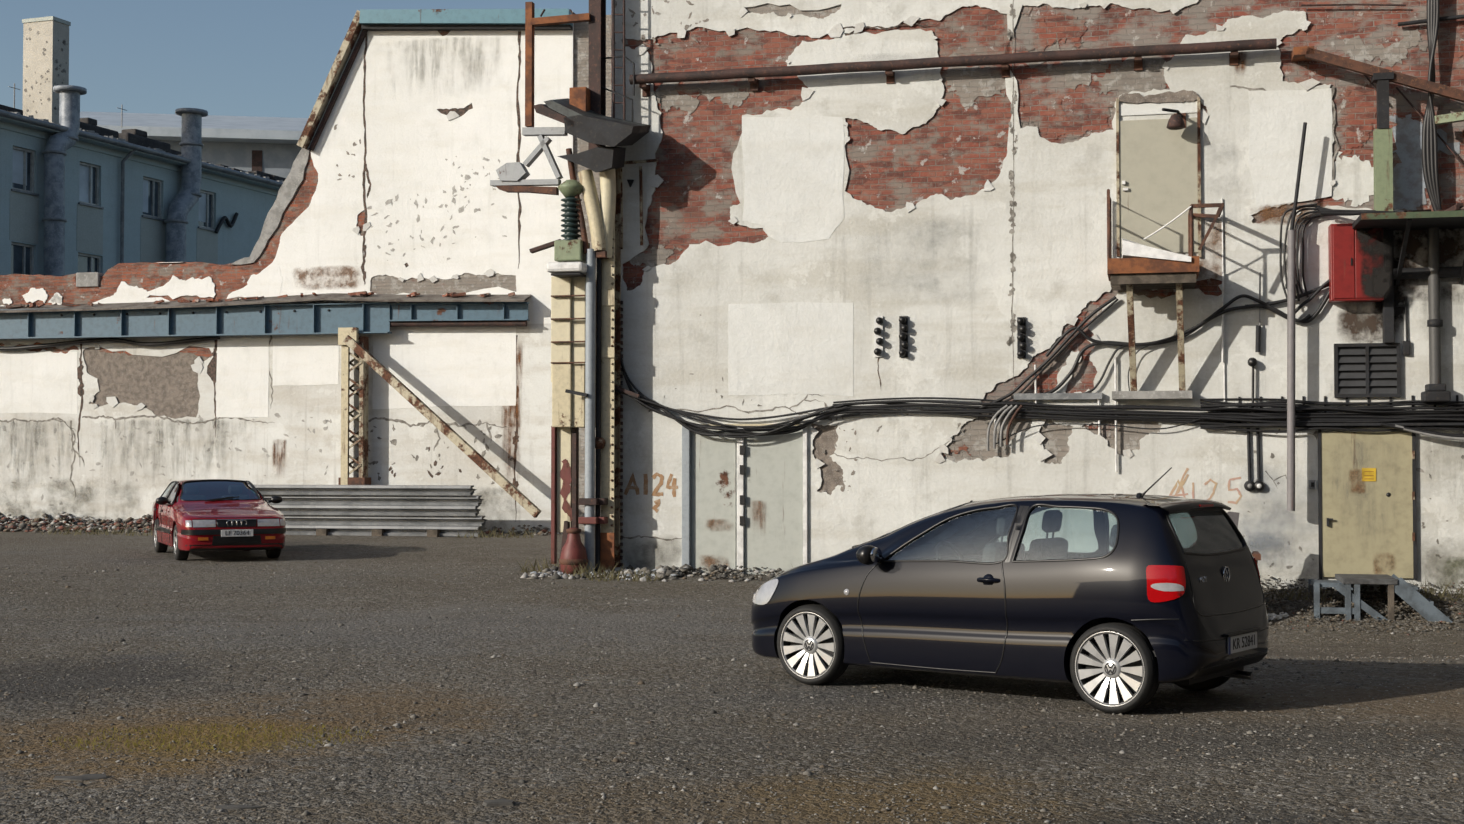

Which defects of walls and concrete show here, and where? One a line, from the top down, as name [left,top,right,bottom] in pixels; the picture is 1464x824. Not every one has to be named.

flaking render [0,151,318,306]
crack [361,34,371,285]
flaking render [615,0,1464,291]
flaking render [0,342,242,508]
crack [0,335,274,500]
peeling [274,413,332,475]
flaking render [811,402,858,495]
flaking render [934,278,1229,464]